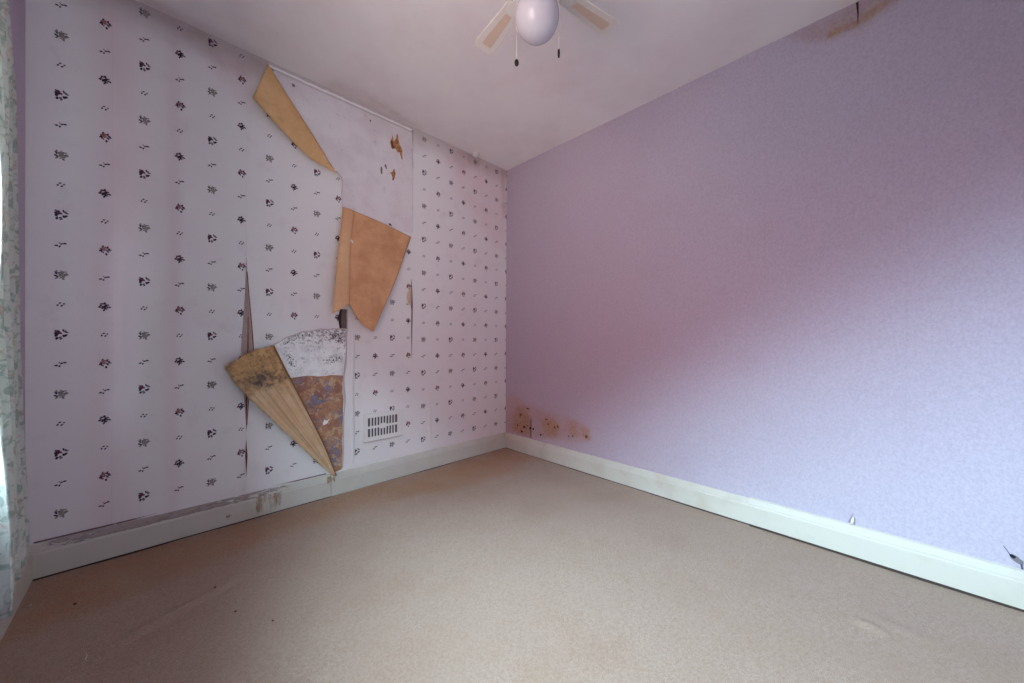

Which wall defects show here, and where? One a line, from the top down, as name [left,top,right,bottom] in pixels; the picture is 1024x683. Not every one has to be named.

peeling [269,64,412,181]